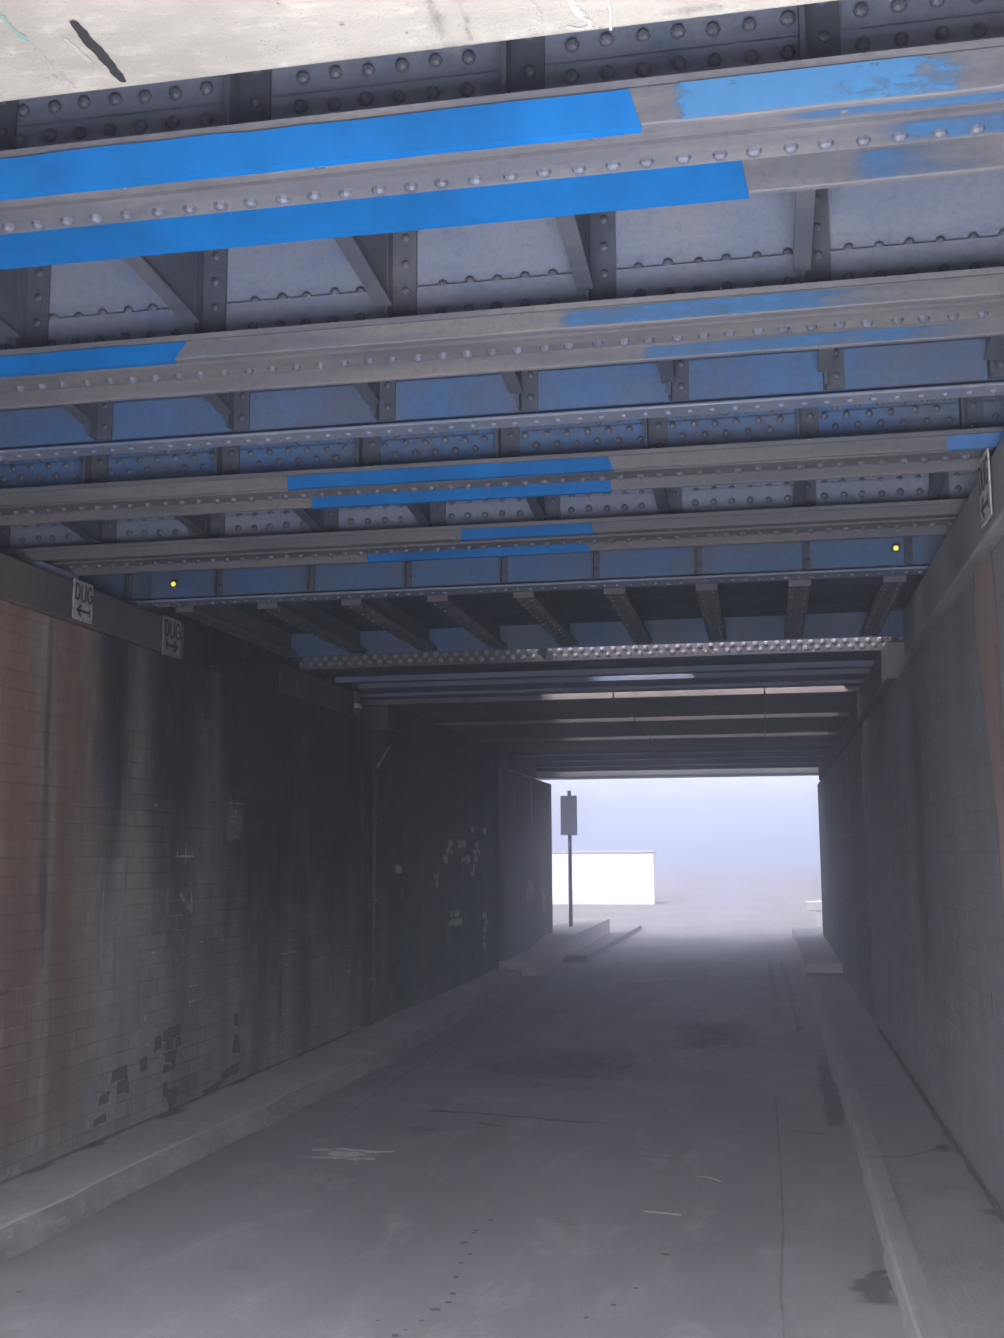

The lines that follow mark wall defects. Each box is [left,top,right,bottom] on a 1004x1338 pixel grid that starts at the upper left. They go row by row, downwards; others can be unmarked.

damp [102,632,128,847]
damp [148,598,367,927]
spalling [93,1024,181,1128]